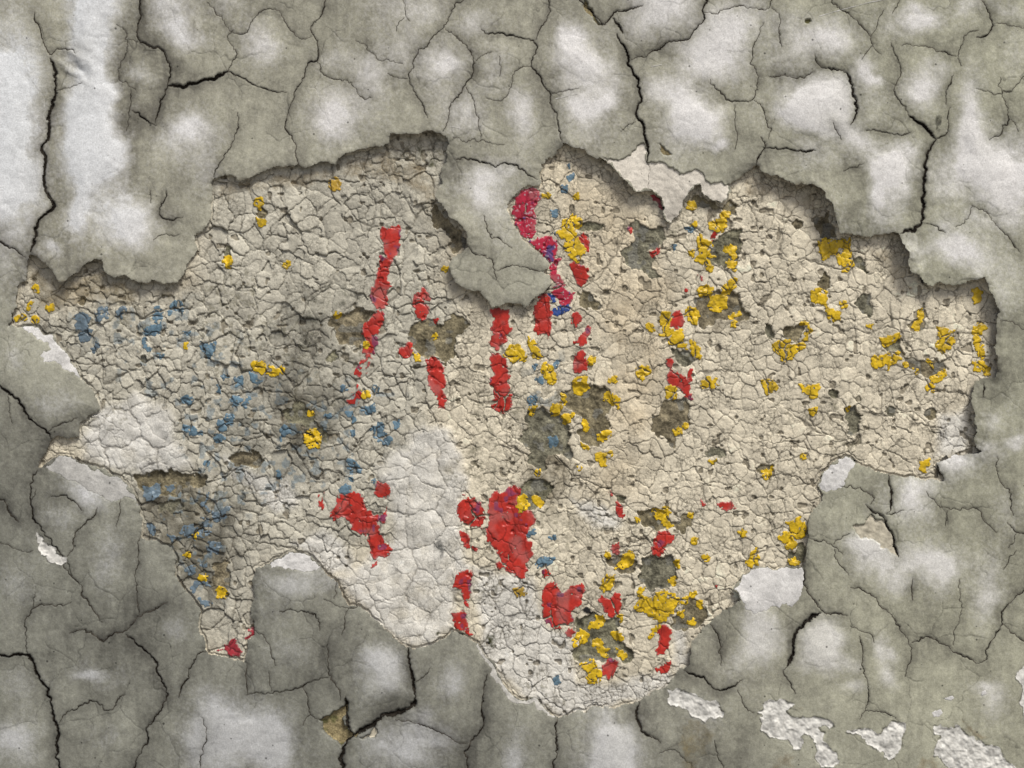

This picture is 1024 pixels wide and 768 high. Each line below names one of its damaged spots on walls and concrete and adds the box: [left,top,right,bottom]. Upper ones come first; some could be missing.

crack [0,12,81,257]
crack [116,0,371,164]
crack [358,1,578,180]
crack [579,0,1024,250]
peeling [8,130,1000,723]
crack [0,471,207,768]
spalling [321,699,377,745]
crack [245,577,487,768]
peeling [758,699,840,768]
crack [783,570,896,718]
peeling [846,721,906,760]
peeling [932,696,1016,768]